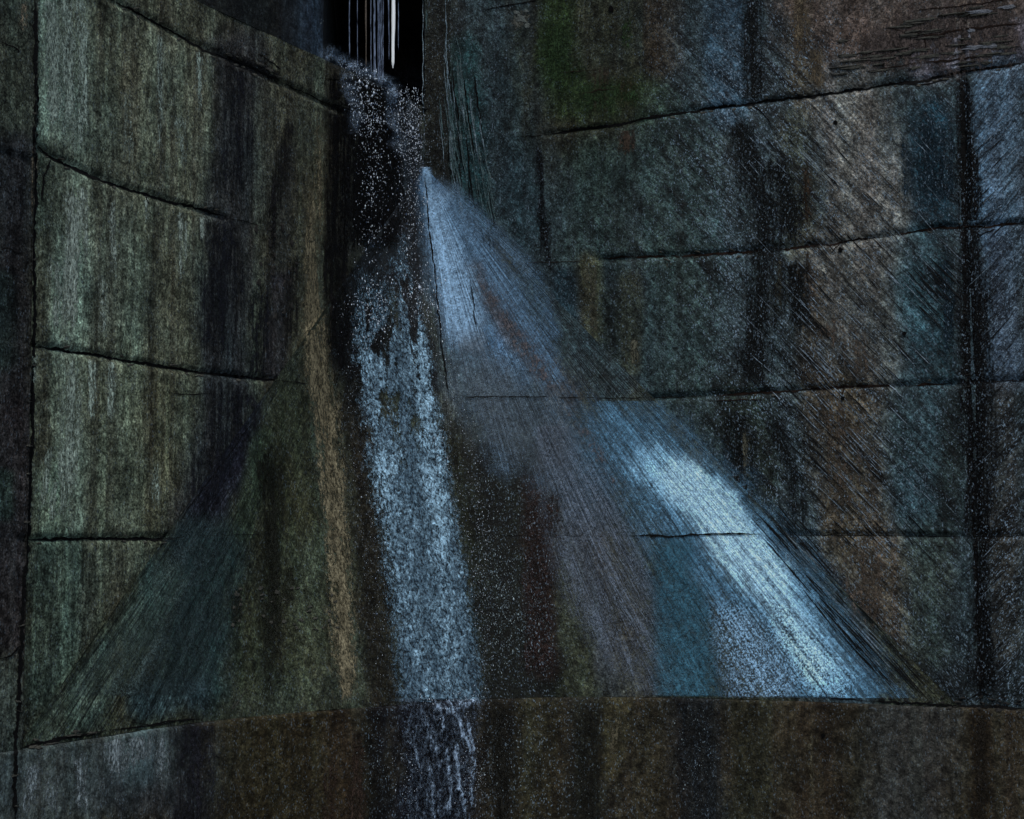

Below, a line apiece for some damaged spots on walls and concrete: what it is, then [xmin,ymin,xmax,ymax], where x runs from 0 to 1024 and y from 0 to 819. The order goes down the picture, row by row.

crack [425,0,1024,713]
leakage [773,535,901,697]
leakage [856,78,1022,690]